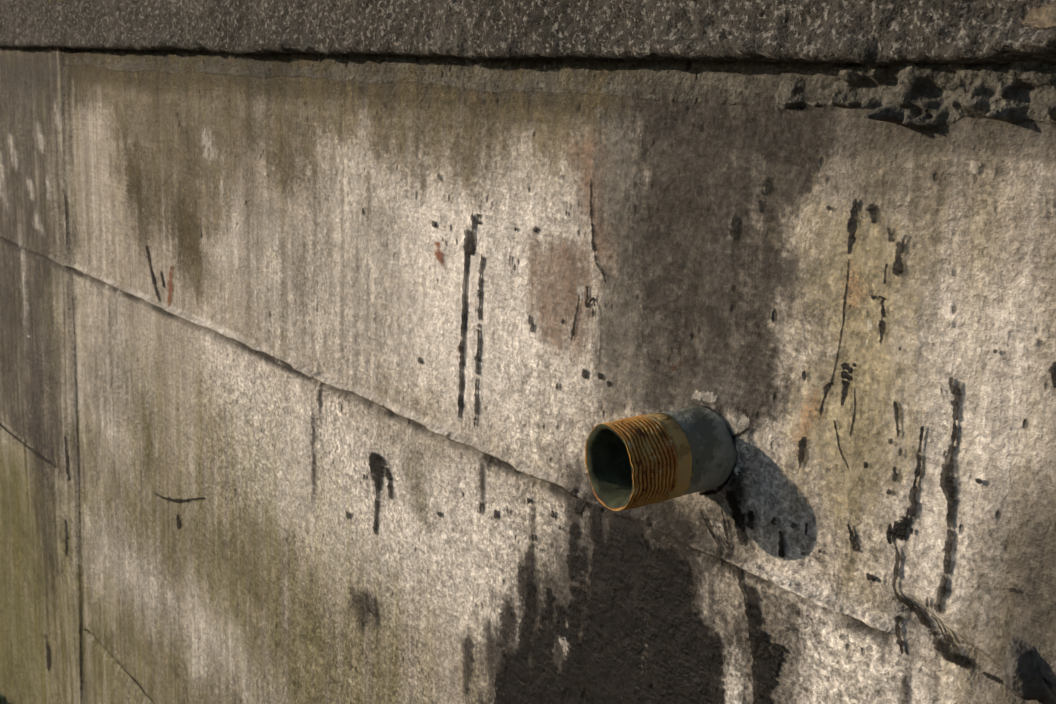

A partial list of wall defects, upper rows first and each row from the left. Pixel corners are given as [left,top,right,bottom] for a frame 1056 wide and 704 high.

damp [0,47,149,610]
damp [457,213,484,429]
damp [528,81,924,544]
damp [73,511,248,704]
damp [462,444,782,704]
damp [771,517,808,558]
damp [847,524,858,552]
damp [925,377,961,614]
crack [892,545,1004,684]